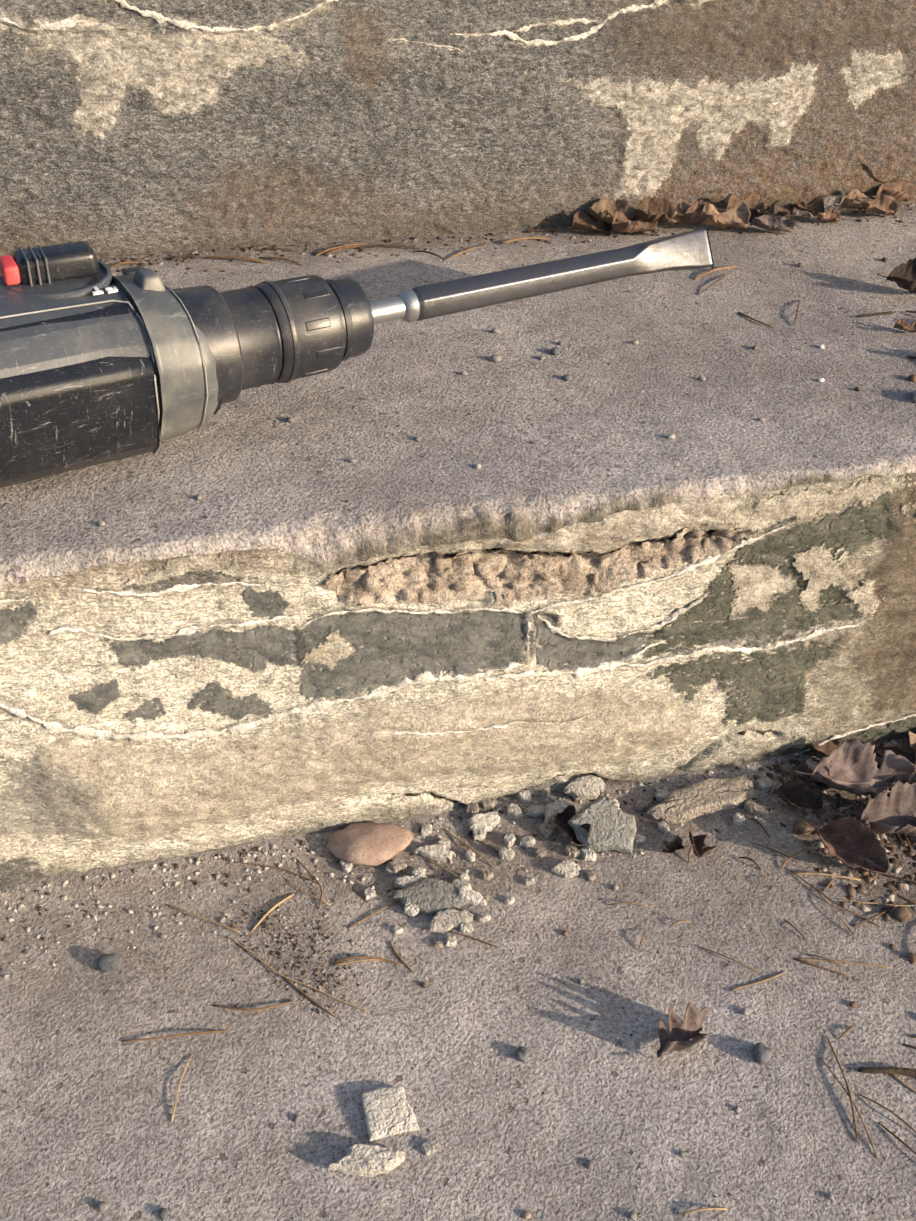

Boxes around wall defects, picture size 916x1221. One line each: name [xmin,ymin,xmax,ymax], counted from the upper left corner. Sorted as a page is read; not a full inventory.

spalling [69,475,916,727]